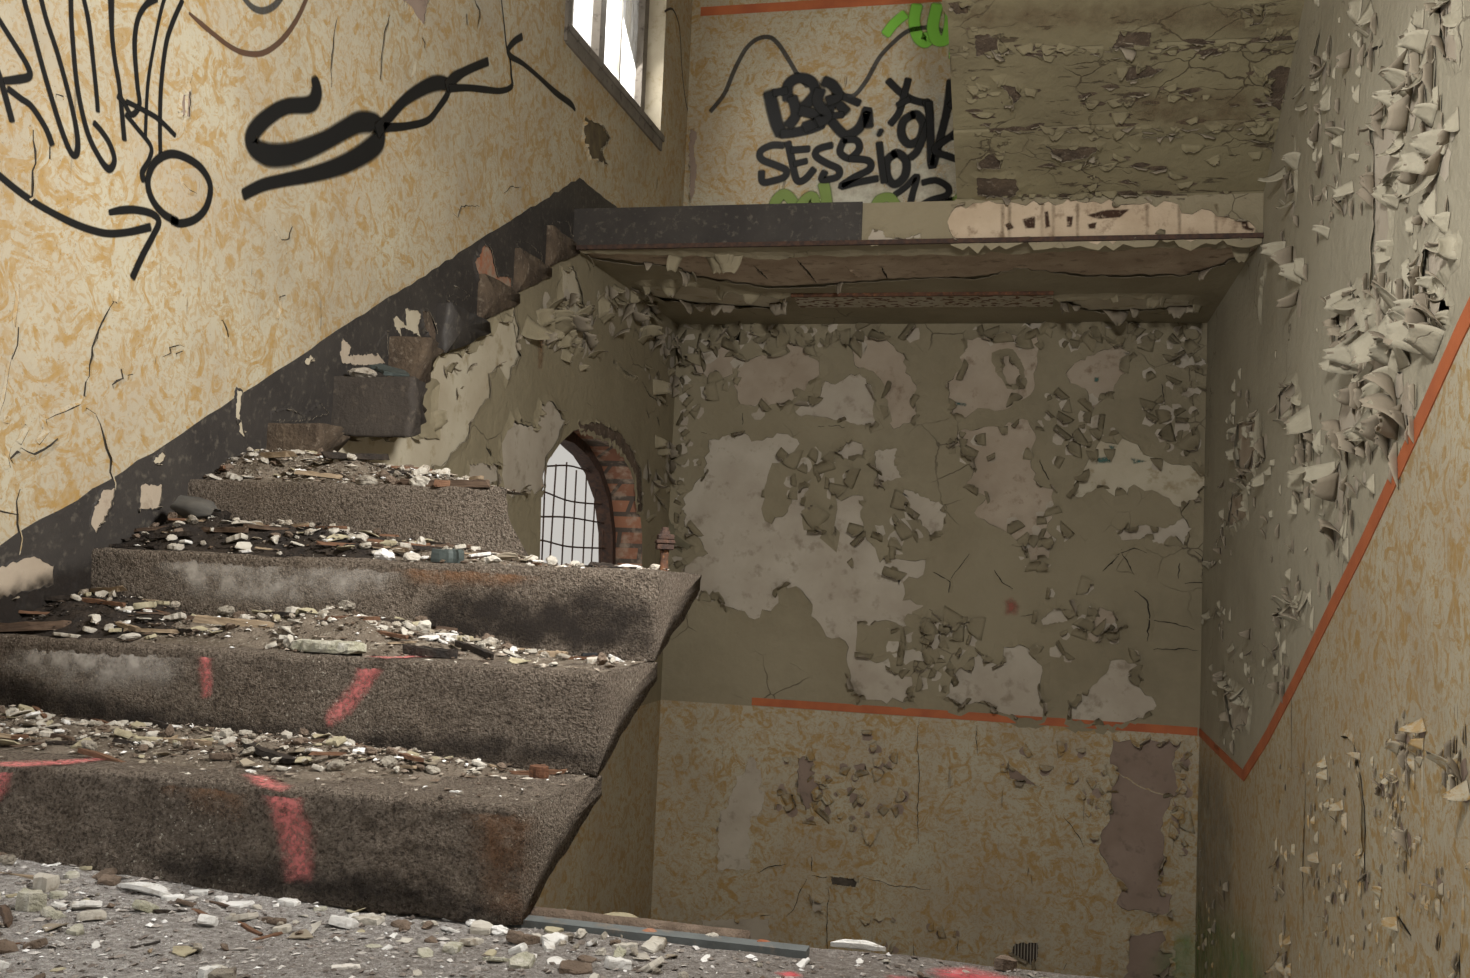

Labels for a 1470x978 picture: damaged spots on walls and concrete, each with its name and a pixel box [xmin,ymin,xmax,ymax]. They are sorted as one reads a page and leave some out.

peeling [89,486,116,535]
peeling [338,0,1465,922]
peeling [1263,710,1470,978]